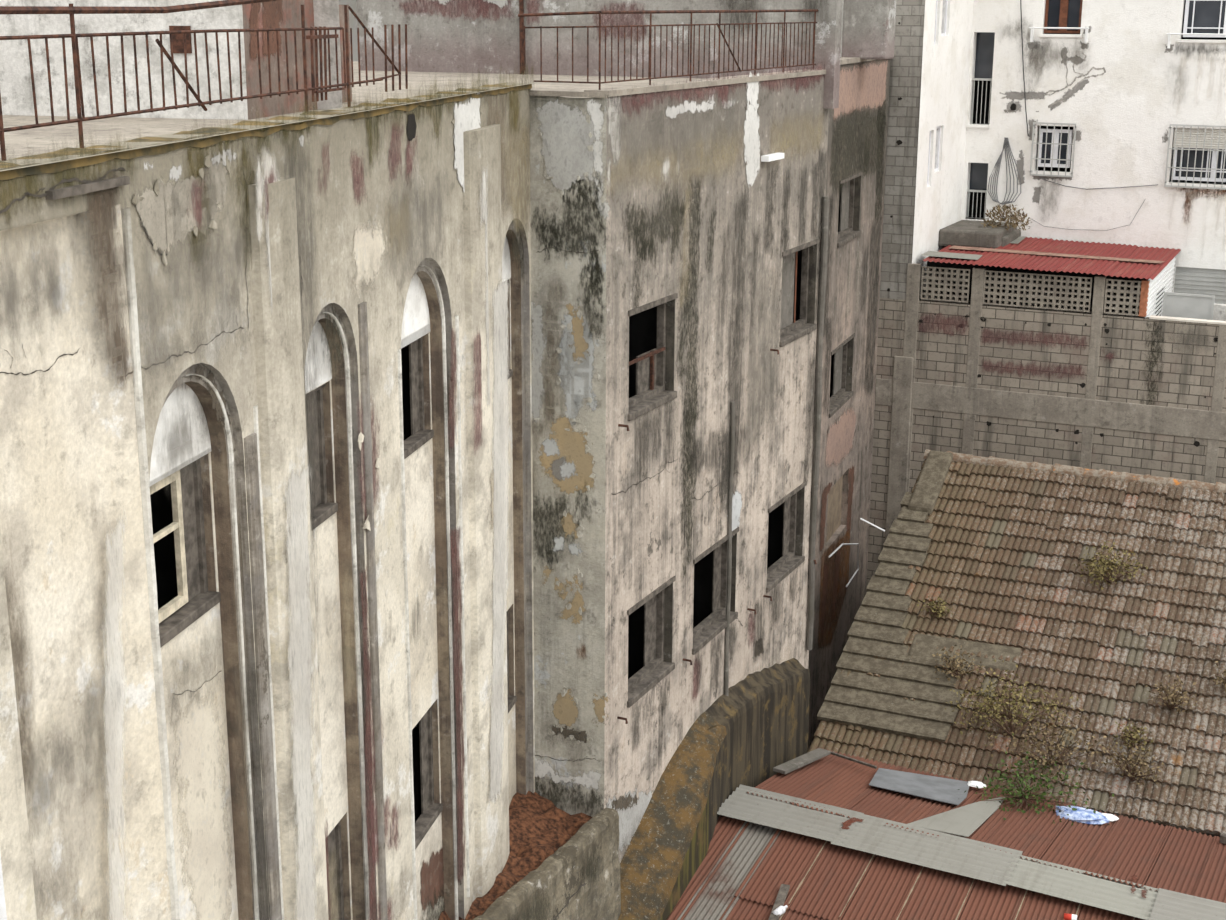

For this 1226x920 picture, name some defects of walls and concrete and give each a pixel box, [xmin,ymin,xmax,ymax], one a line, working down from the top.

peeling [666,87,739,119]
crack [0,344,80,376]
damp [448,329,457,450]
flaking render [531,302,600,624]
damp [473,66,886,799]
damp [450,528,465,882]